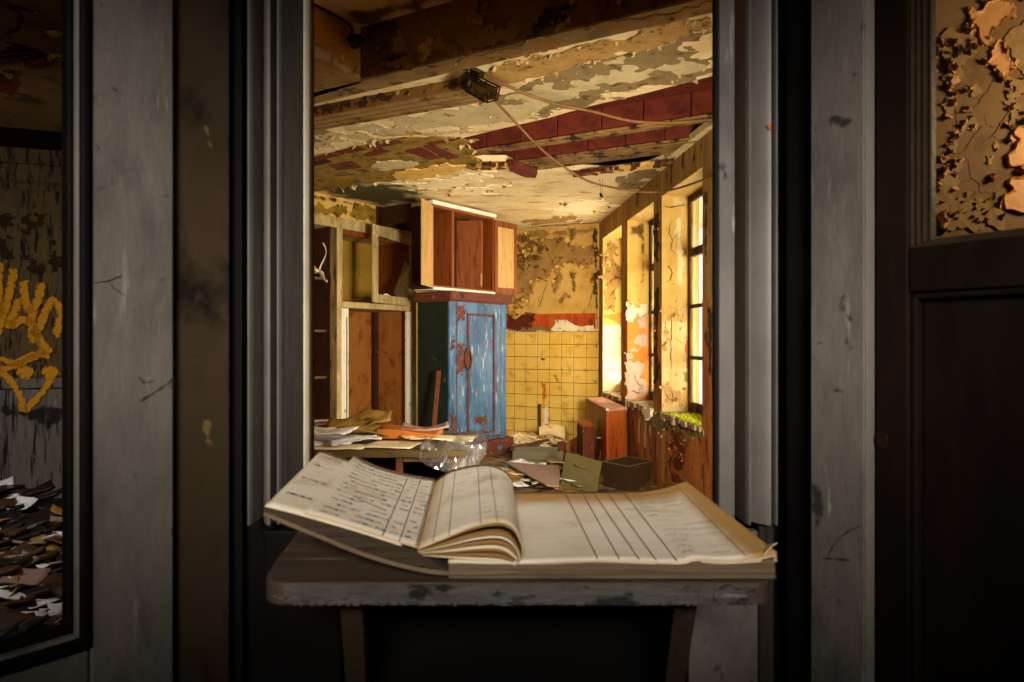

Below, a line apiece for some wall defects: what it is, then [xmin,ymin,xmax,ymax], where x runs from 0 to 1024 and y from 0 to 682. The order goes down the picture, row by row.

peeling [314,184,380,224]
peeling [314,0,712,197]
peeling [936,0,1024,234]
peeling [506,198,704,484]